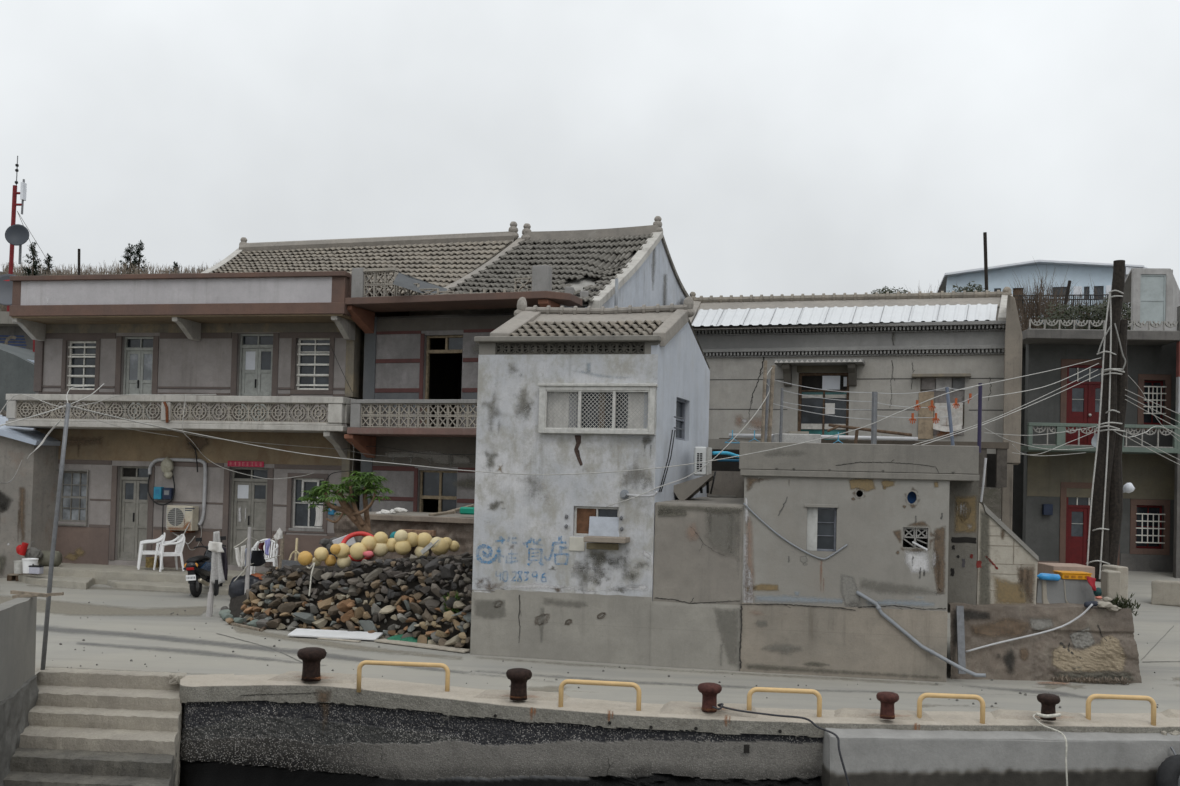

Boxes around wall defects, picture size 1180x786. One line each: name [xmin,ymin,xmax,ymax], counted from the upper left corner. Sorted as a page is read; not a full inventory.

crack [749,355,765,416]
leakage [574,435,583,466]
spalling [972,618,1031,660]
spalling [1052,627,1125,672]